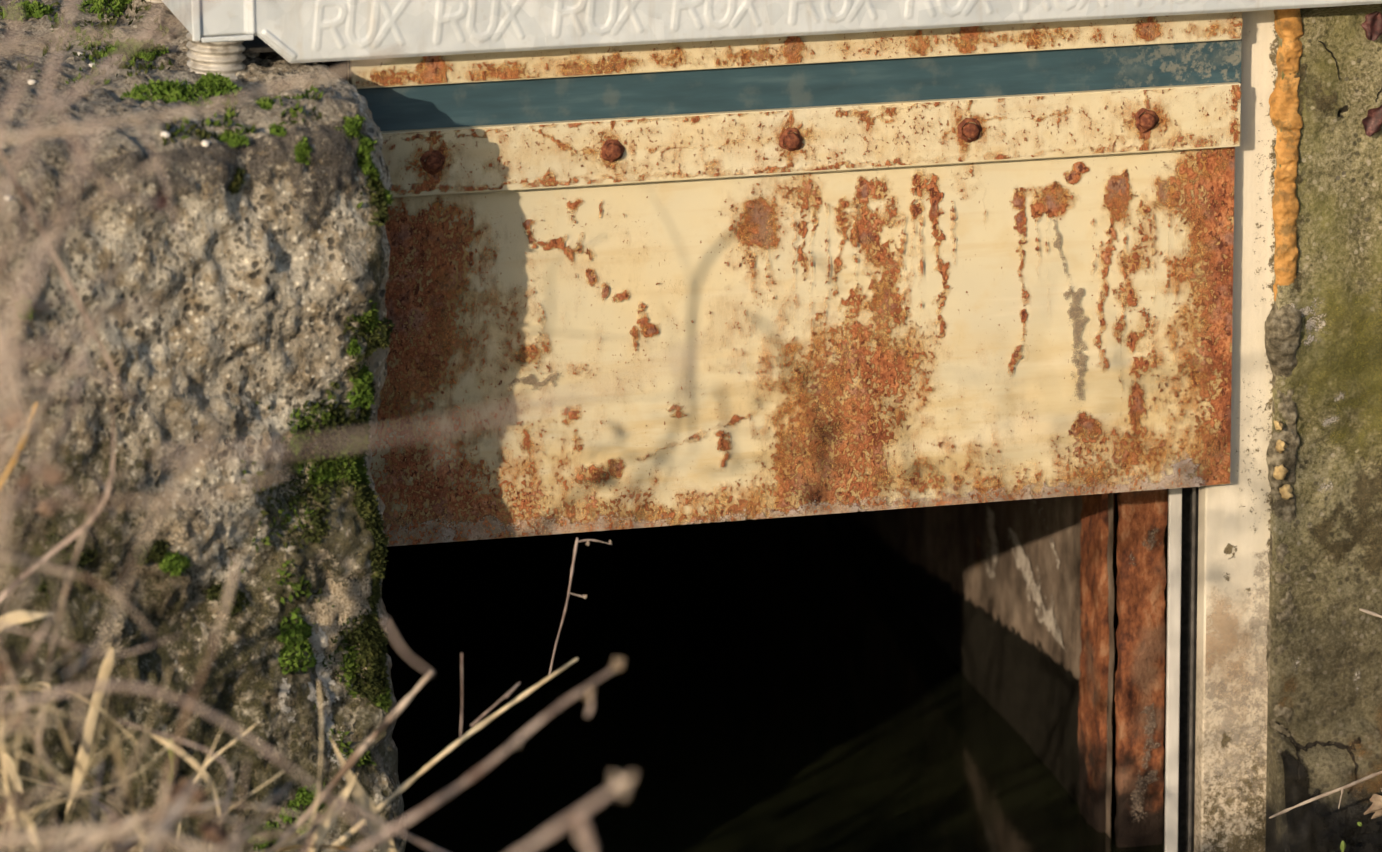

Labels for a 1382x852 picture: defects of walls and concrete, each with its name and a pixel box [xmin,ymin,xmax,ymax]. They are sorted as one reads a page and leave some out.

rust [356,16,1242,87]
rust [370,85,1242,545]
damp [1053,219,1089,400]